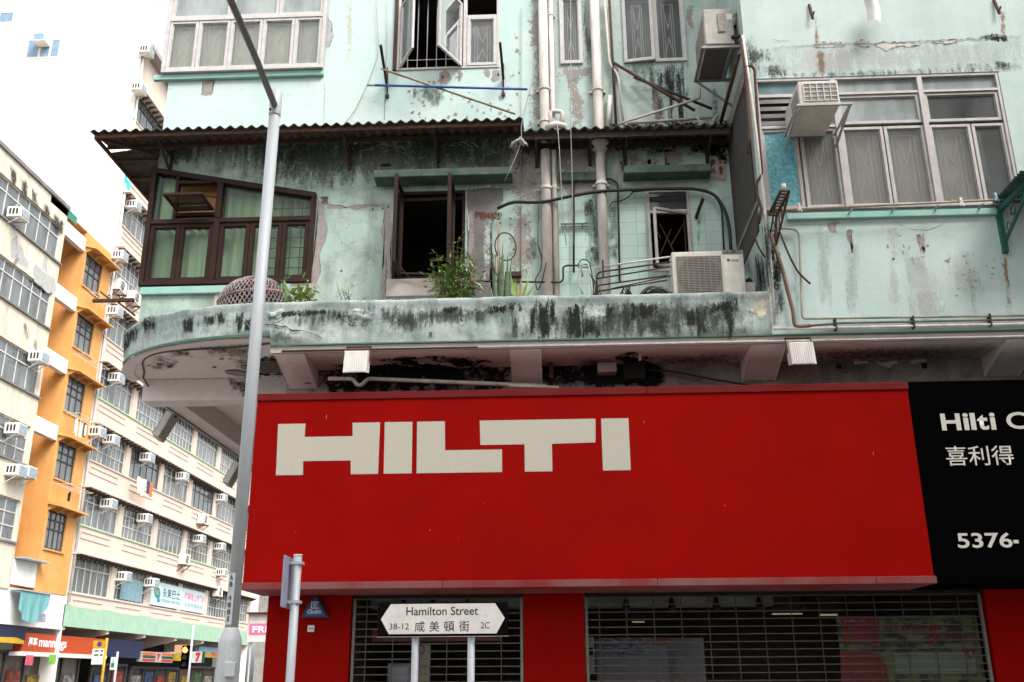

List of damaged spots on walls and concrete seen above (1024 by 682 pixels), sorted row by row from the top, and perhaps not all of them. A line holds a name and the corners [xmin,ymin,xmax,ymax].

flaking render [814,39,958,51]
peeling [407,69,520,120]
damp [610,64,726,128]
damp [608,144,728,164]
damp [149,138,541,285]
damp [382,215,783,342]
damp [123,312,251,357]
damp [275,309,368,345]
damp [205,344,282,397]